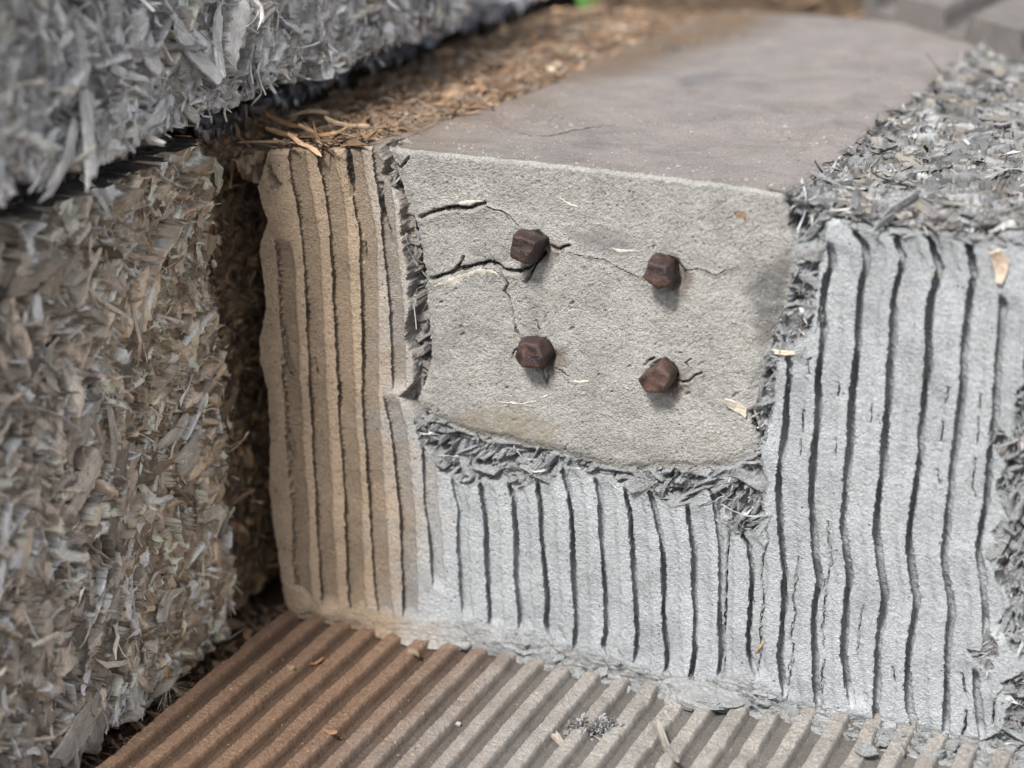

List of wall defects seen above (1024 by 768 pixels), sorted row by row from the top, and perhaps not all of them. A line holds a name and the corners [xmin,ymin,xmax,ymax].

crack [426,203,516,223]
crack [434,244,645,356]
spalling [380,138,859,538]